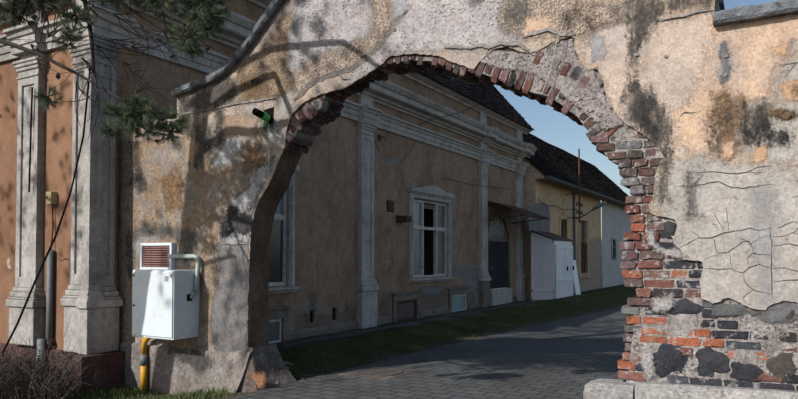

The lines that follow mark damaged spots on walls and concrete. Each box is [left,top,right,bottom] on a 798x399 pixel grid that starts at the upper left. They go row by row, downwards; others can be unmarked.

crack [444,27,574,59]
water stain [620,0,712,202]
water stain [741,97,788,146]
peeling [119,0,798,352]
crack [680,165,769,189]
crack [680,212,798,300]